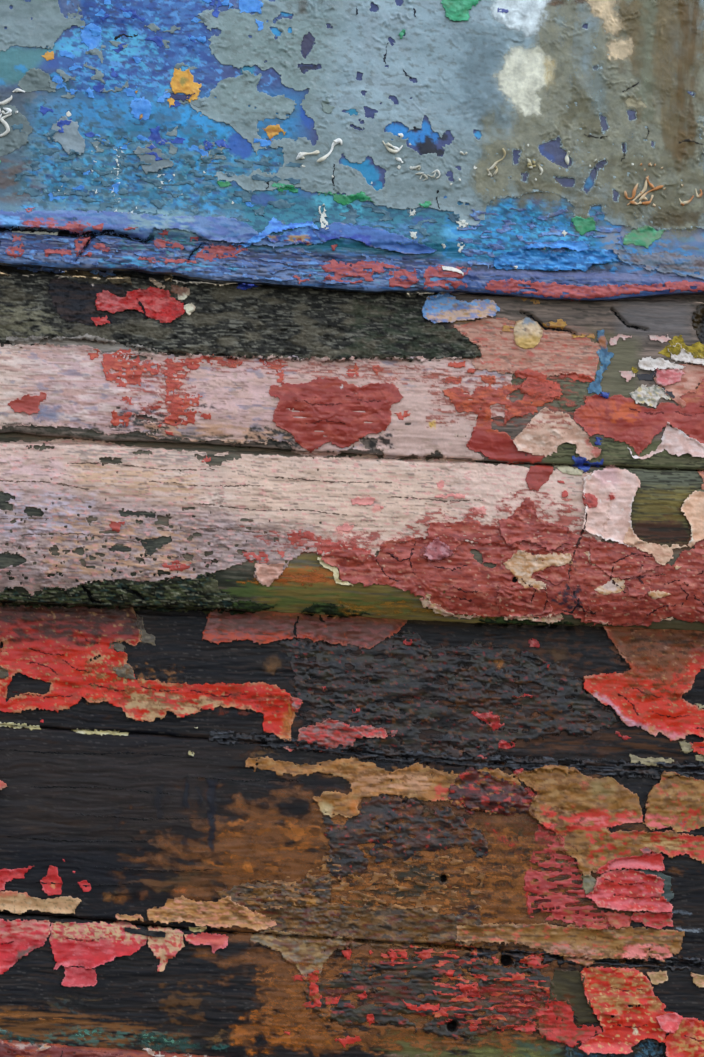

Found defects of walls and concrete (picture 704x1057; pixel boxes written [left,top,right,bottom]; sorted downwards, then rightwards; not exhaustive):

peeling [554,0,610,108]
peeling [0,0,548,266]
crack [376,541,478,602]
crack [521,509,596,616]
crack [610,552,704,616]
peeling [0,251,704,1057]